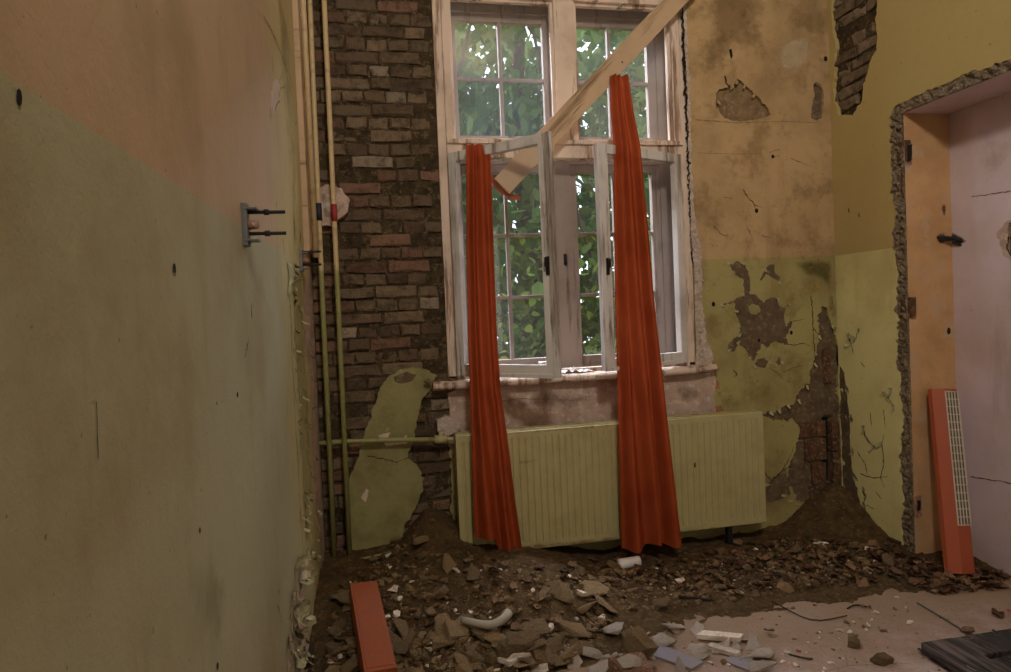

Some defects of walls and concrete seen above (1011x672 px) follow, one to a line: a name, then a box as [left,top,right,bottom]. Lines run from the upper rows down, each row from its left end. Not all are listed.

flaking render [811,82,822,120]
flaking render [824,0,877,115]
flaking render [288,0,471,672]
flaking render [500,379,618,428]
peeling [663,3,793,416]
flaking render [763,307,866,509]
flaking render [889,59,1011,554]